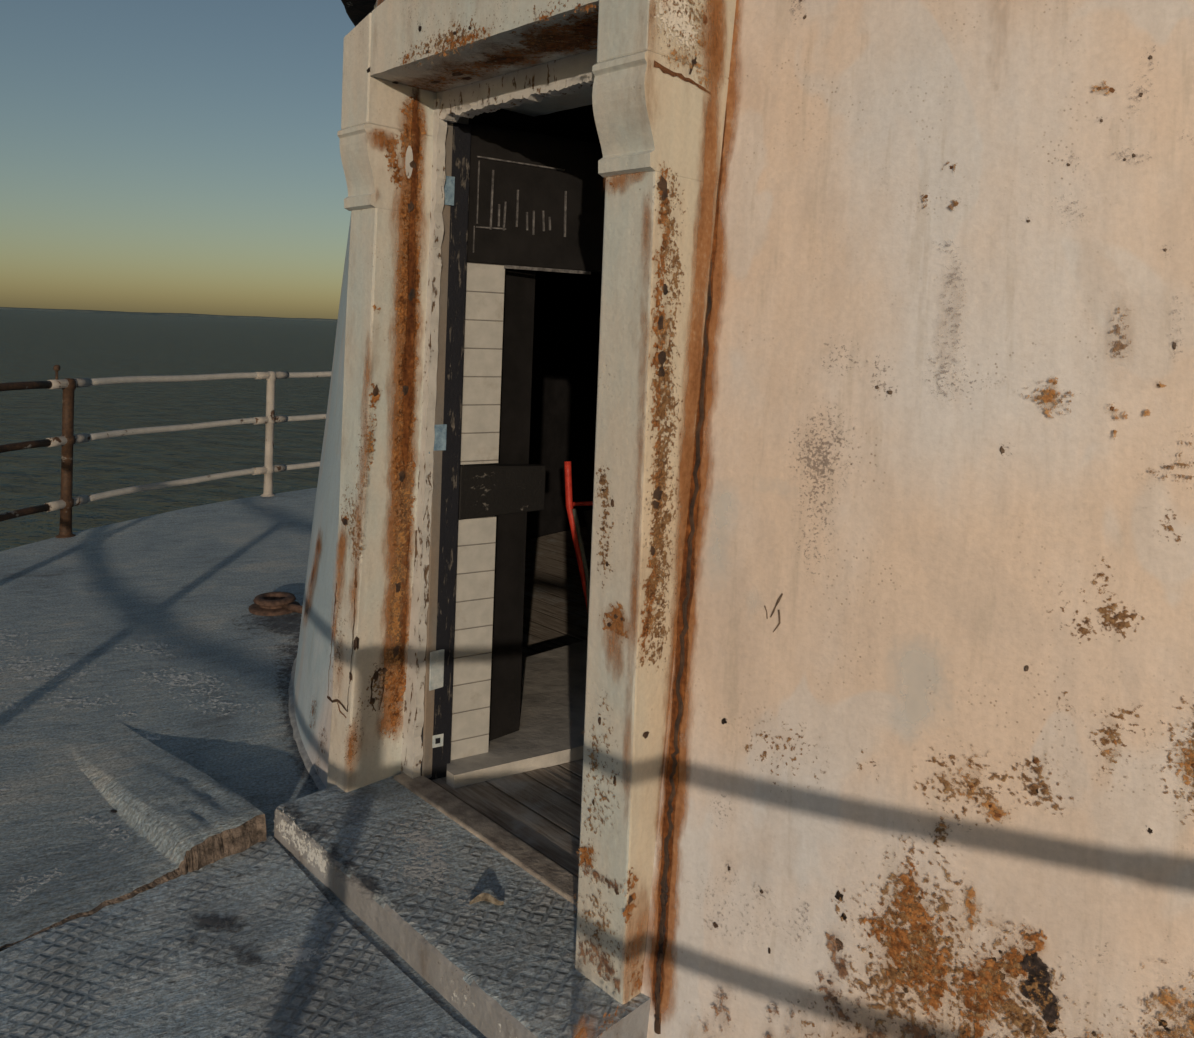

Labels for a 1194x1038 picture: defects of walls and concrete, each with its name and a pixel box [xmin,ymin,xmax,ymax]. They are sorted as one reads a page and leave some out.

rust [331,0,599,740]
rust [1025,377,1074,418]
rust [1110,307,1131,358]
rust [1149,433,1194,481]
rust [622,0,739,1019]
rust [599,546,639,662]
rust [1050,559,1144,644]
rust [745,725,818,787]
rust [1090,709,1145,774]
rust [1160,720,1194,825]
rust [764,748,1075,1038]
rust [1085,971,1194,1038]